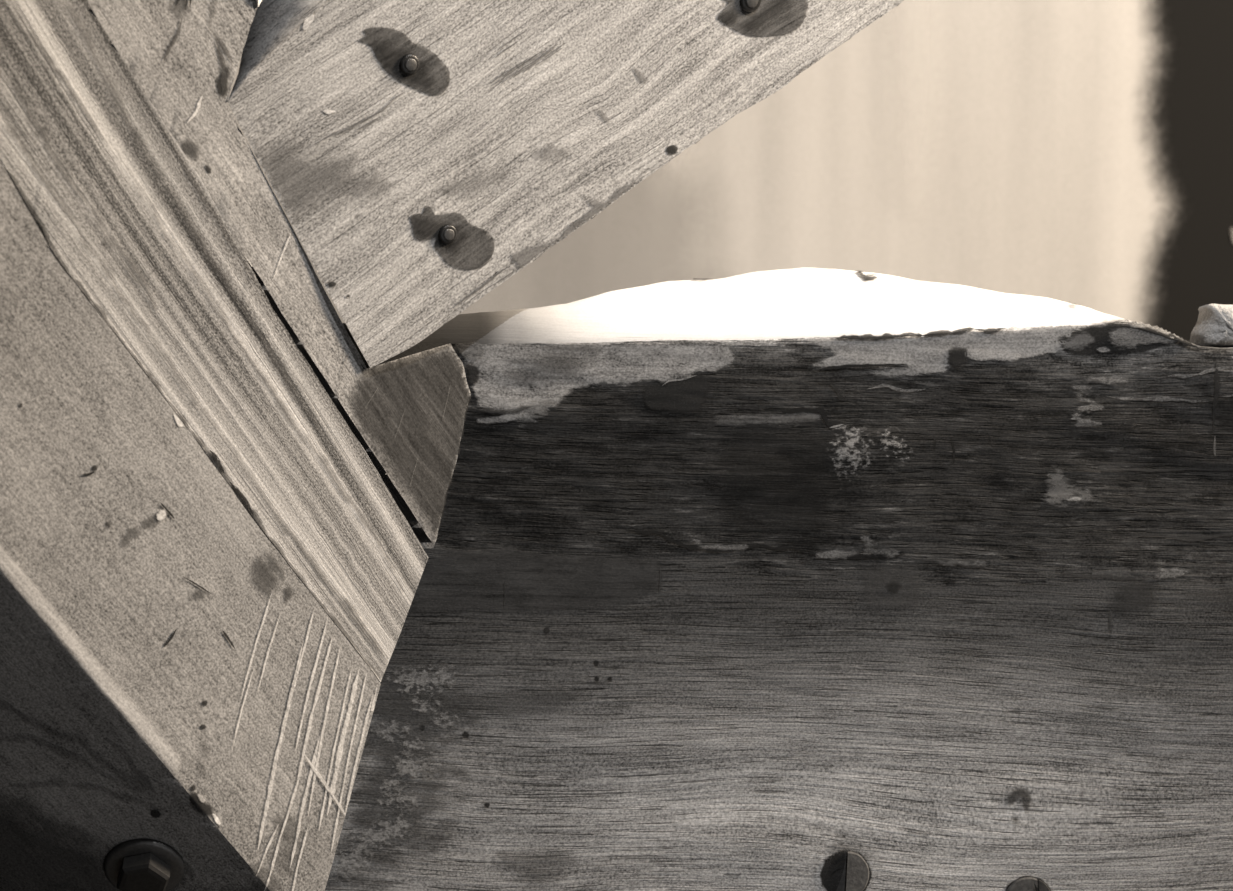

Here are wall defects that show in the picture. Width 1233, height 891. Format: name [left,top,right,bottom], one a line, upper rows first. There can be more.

peeling [1045,470,1093,507]